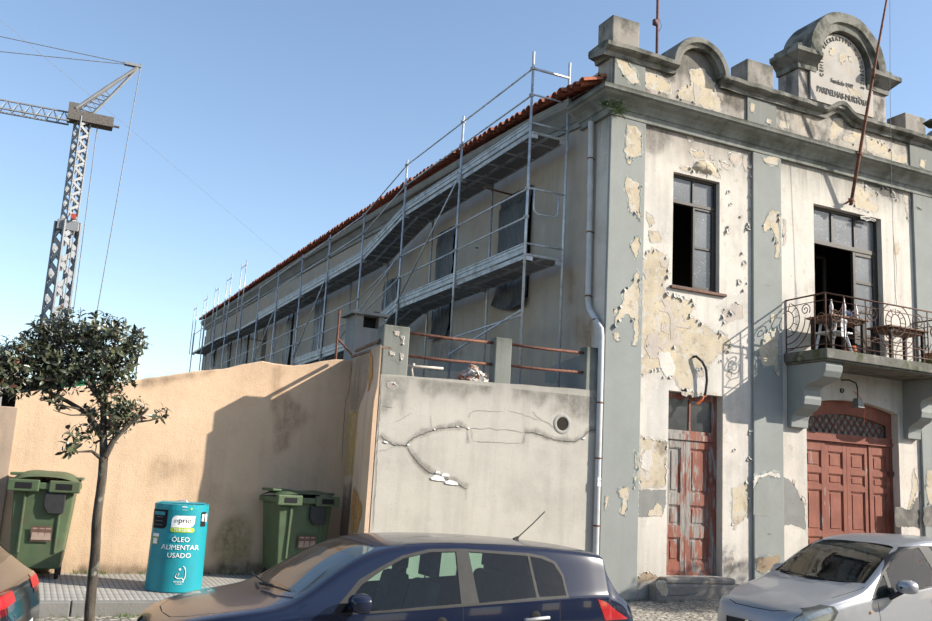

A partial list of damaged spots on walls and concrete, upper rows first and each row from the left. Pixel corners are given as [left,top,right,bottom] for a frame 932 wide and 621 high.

peeling [615,57,721,112]
flaking render [679,136,780,231]
peeling [613,123,748,398]
peeling [762,209,788,259]
crack [373,383,595,521]
peeling [604,434,669,516]
peeling [730,469,781,531]
peeling [907,468,932,510]